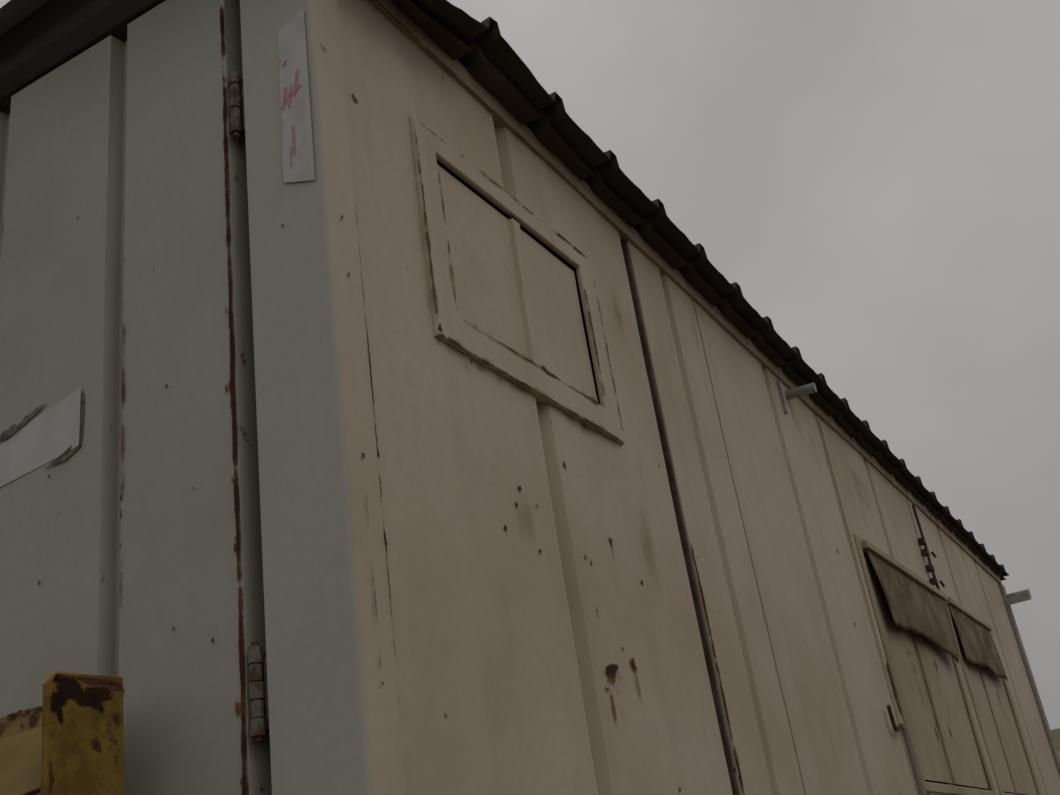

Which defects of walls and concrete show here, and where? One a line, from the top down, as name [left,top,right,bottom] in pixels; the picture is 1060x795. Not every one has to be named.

corrosion [219,6,263,795]
corrosion [606,647,640,721]